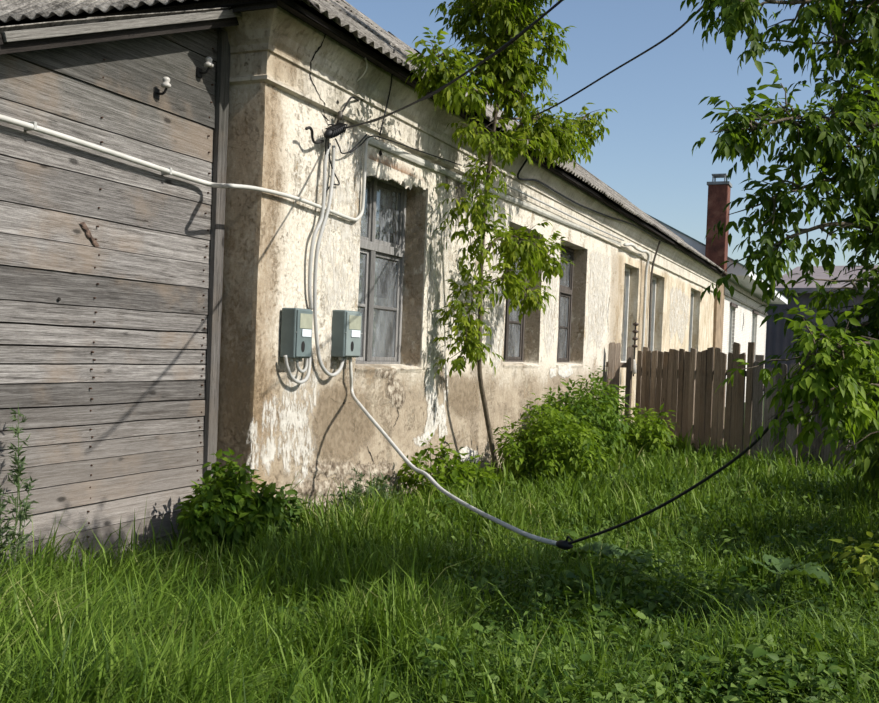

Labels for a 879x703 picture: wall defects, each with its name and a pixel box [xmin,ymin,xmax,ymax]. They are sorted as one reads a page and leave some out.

flaking render [376,369,405,409]
peeling [413,207,453,447]